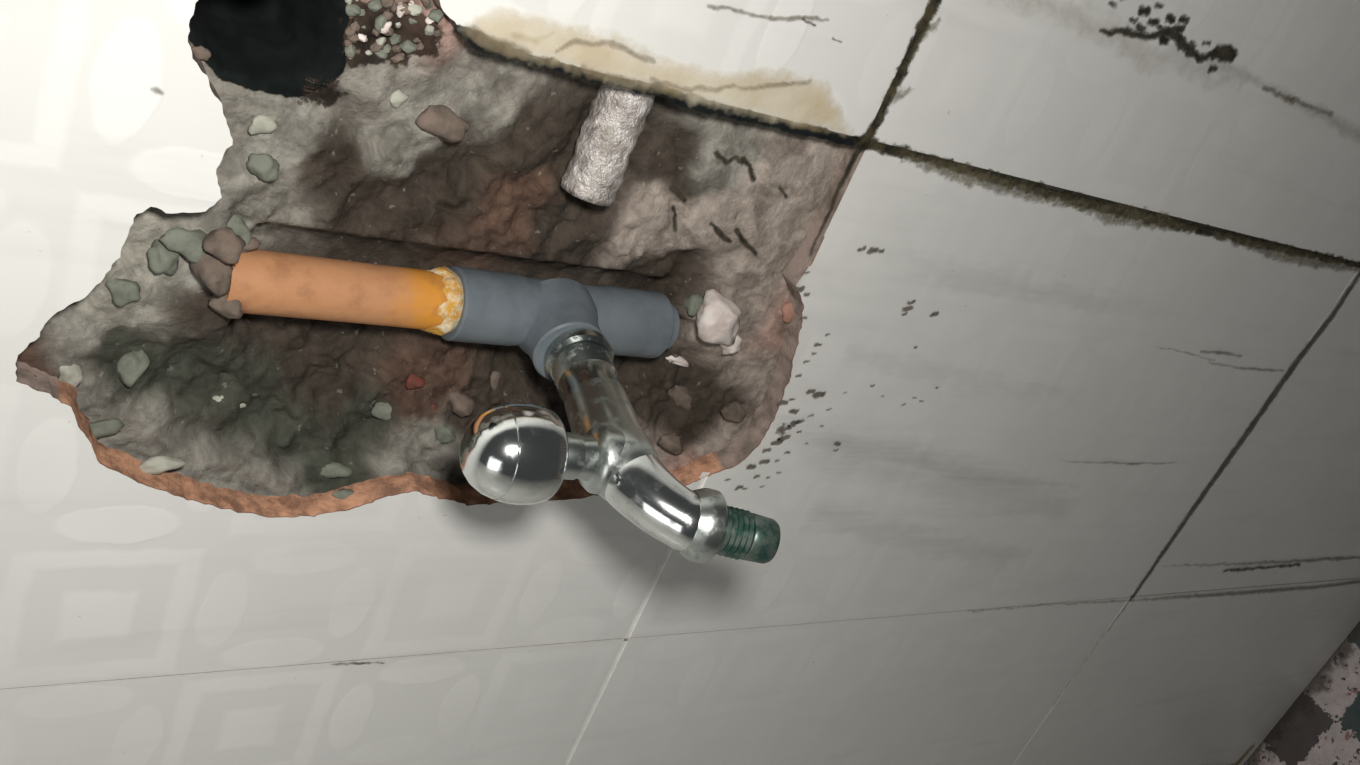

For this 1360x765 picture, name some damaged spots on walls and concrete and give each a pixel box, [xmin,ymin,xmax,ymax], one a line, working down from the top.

spalling [15,0,865,517]
leakage [469,19,838,128]
leakage [855,0,1360,271]